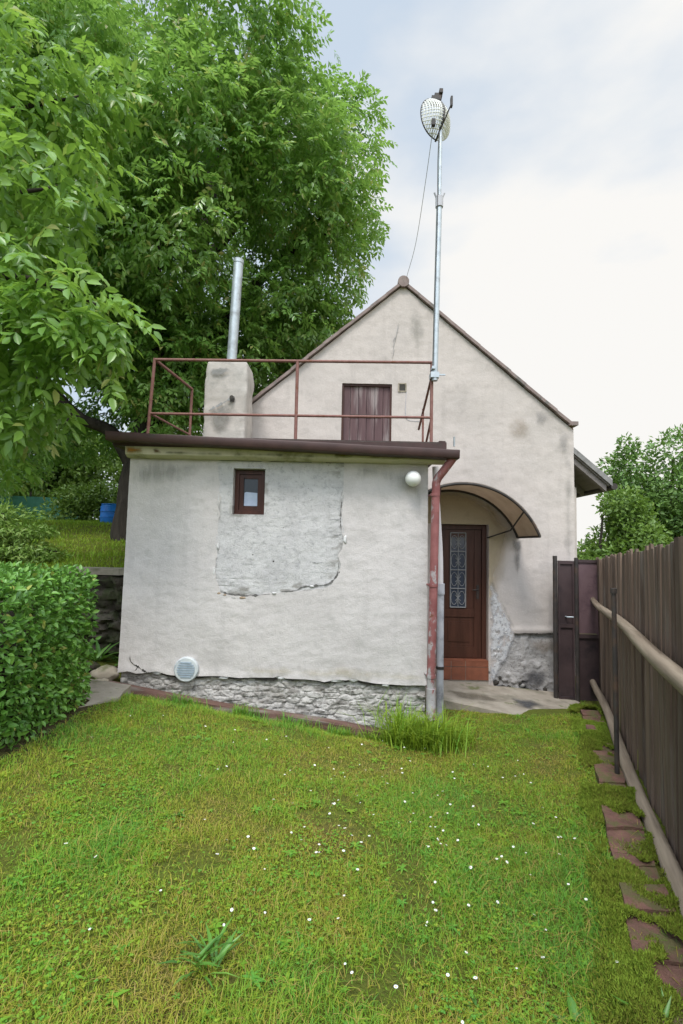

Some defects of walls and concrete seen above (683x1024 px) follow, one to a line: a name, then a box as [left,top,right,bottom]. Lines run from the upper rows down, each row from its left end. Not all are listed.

peeling [213,461,347,599]
spalling [489,587,554,692]